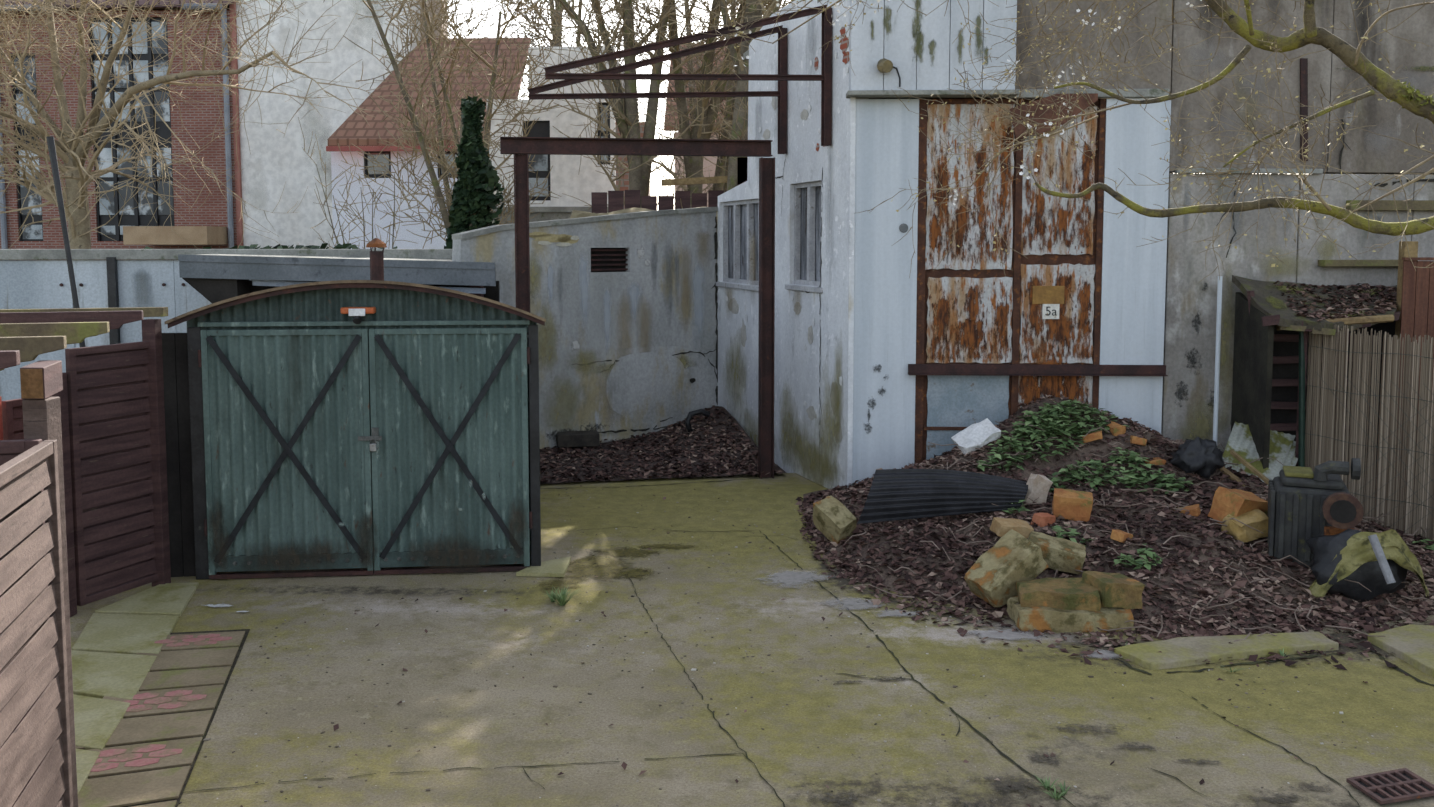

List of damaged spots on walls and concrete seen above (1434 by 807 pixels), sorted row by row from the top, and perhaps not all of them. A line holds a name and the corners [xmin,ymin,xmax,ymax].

water stain [871,8,892,39]
water stain [913,32,936,62]
water stain [957,16,988,64]
corrosion [929,93,1098,265]
corrosion [929,273,1091,406]